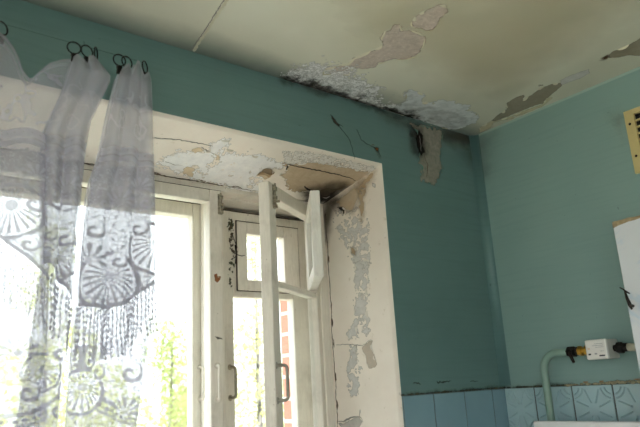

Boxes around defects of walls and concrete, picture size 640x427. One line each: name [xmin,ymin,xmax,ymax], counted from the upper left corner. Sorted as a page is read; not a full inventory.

peeling [322,24,426,76]
peeling [609,39,640,58]
damp [280,55,415,119]
peeling [493,83,562,121]
crack [330,114,381,159]
peeling [383,89,479,185]
peeling [155,138,376,193]
peeling [333,206,377,396]